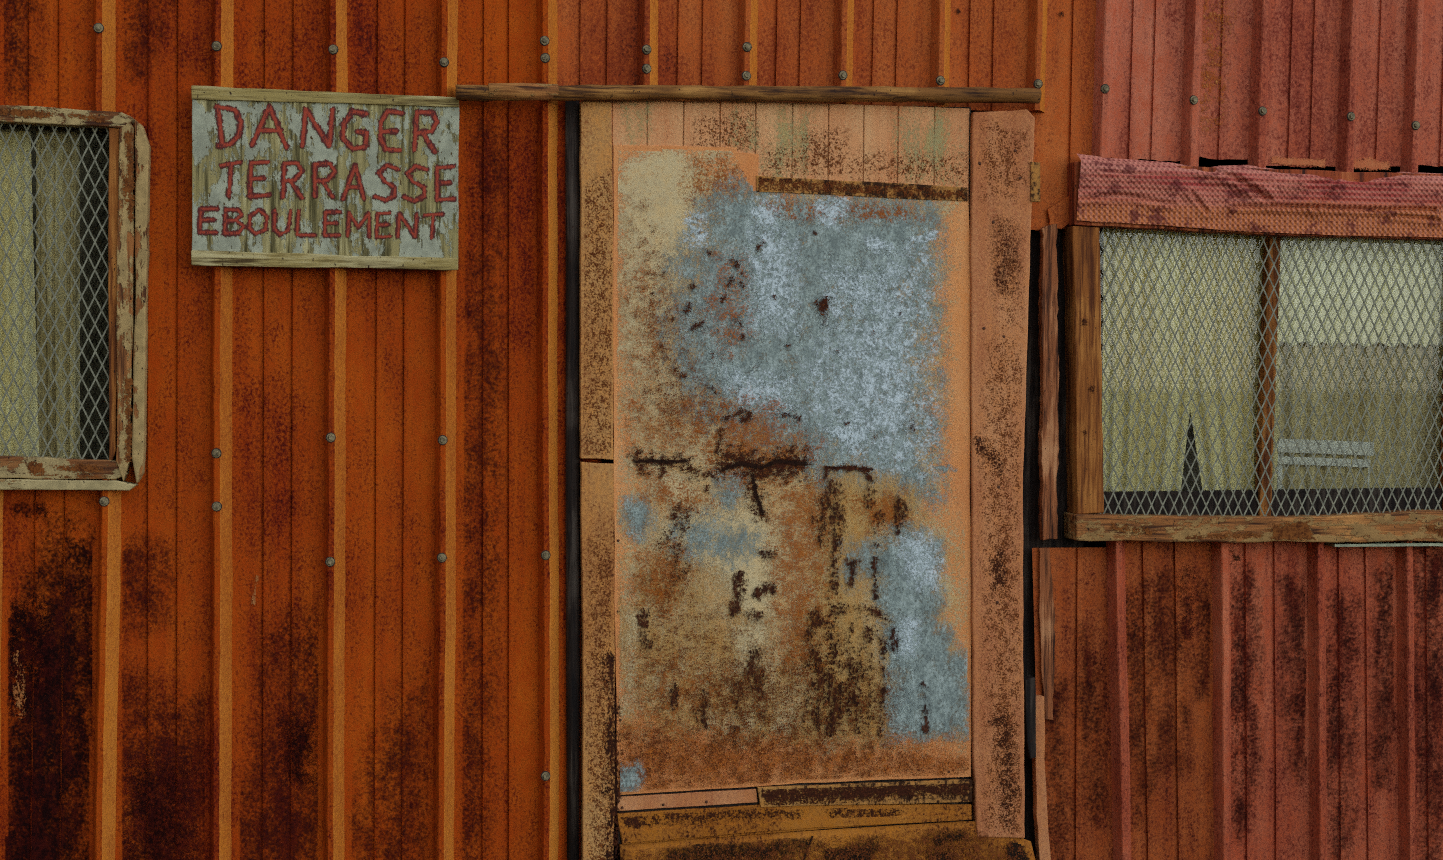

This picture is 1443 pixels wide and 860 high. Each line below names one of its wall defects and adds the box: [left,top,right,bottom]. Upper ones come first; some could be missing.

peeling [122,130,136,221]
peeling [25,461,111,477]
peeling [123,377,133,463]
peeling [617,101,970,745]
corrosion [583,113,1028,860]
corrosion [1042,631,1109,860]
corrosion [1126,566,1211,823]
corrosion [1230,550,1307,839]
corrosion [1326,562,1396,860]
corrosion [1413,541,1443,860]